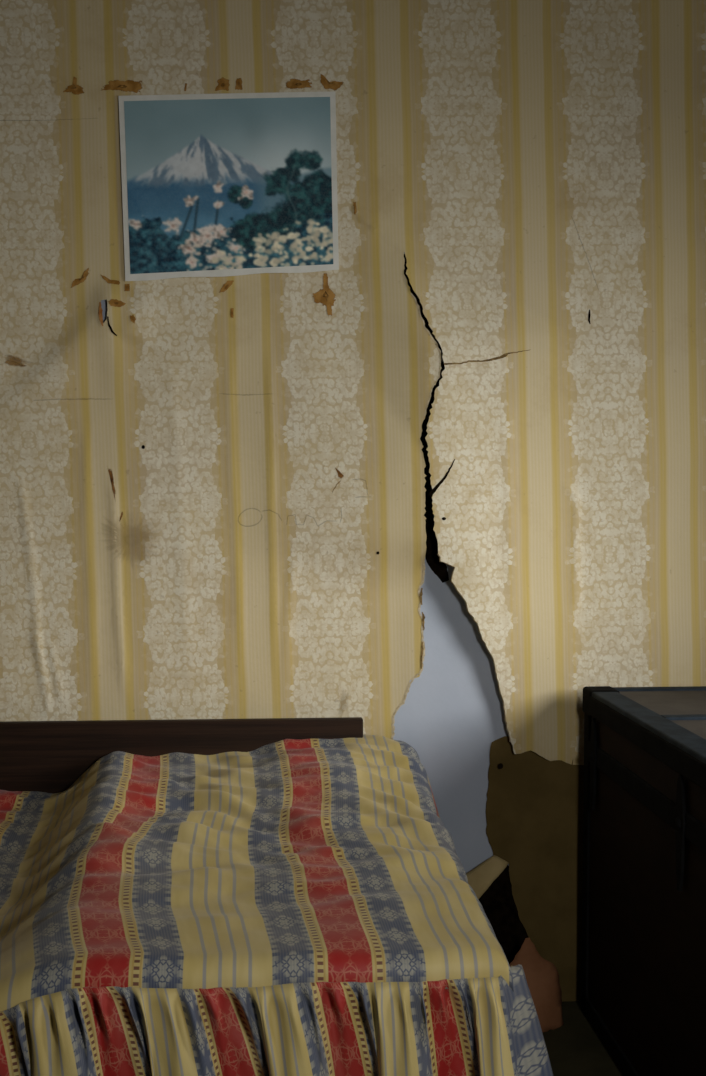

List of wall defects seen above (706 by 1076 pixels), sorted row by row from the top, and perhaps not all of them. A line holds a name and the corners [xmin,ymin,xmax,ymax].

crack [404,254,529,583]